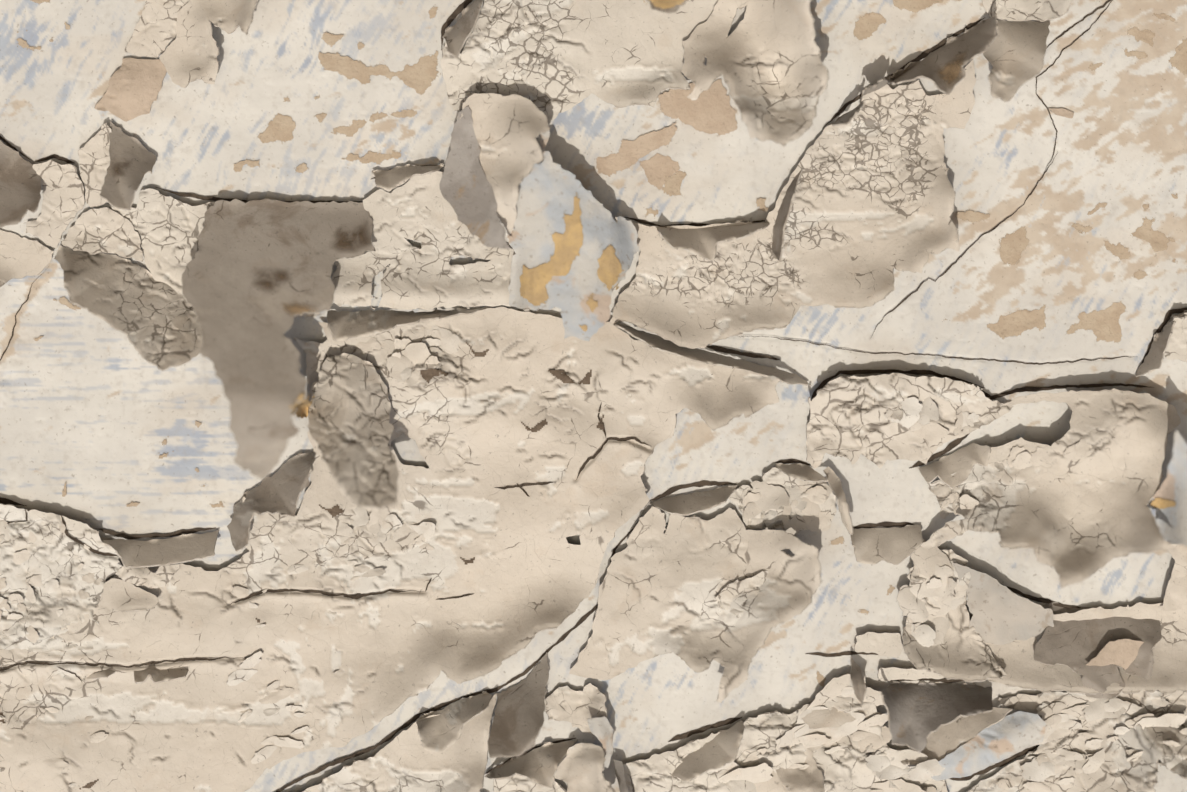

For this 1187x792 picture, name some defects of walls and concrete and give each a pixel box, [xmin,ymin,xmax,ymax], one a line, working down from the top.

spalling [318,32,441,95]
peeling [596,0,829,196]
crack [706,0,1187,420]
spalling [1066,301,1126,343]
peeling [1164,313,1187,362]
peeling [0,60,990,792]
crack [0,497,27,524]
crack [61,515,215,557]
crack [227,578,473,606]
crack [0,657,247,682]
peeling [1086,638,1144,670]
crack [275,604,598,792]